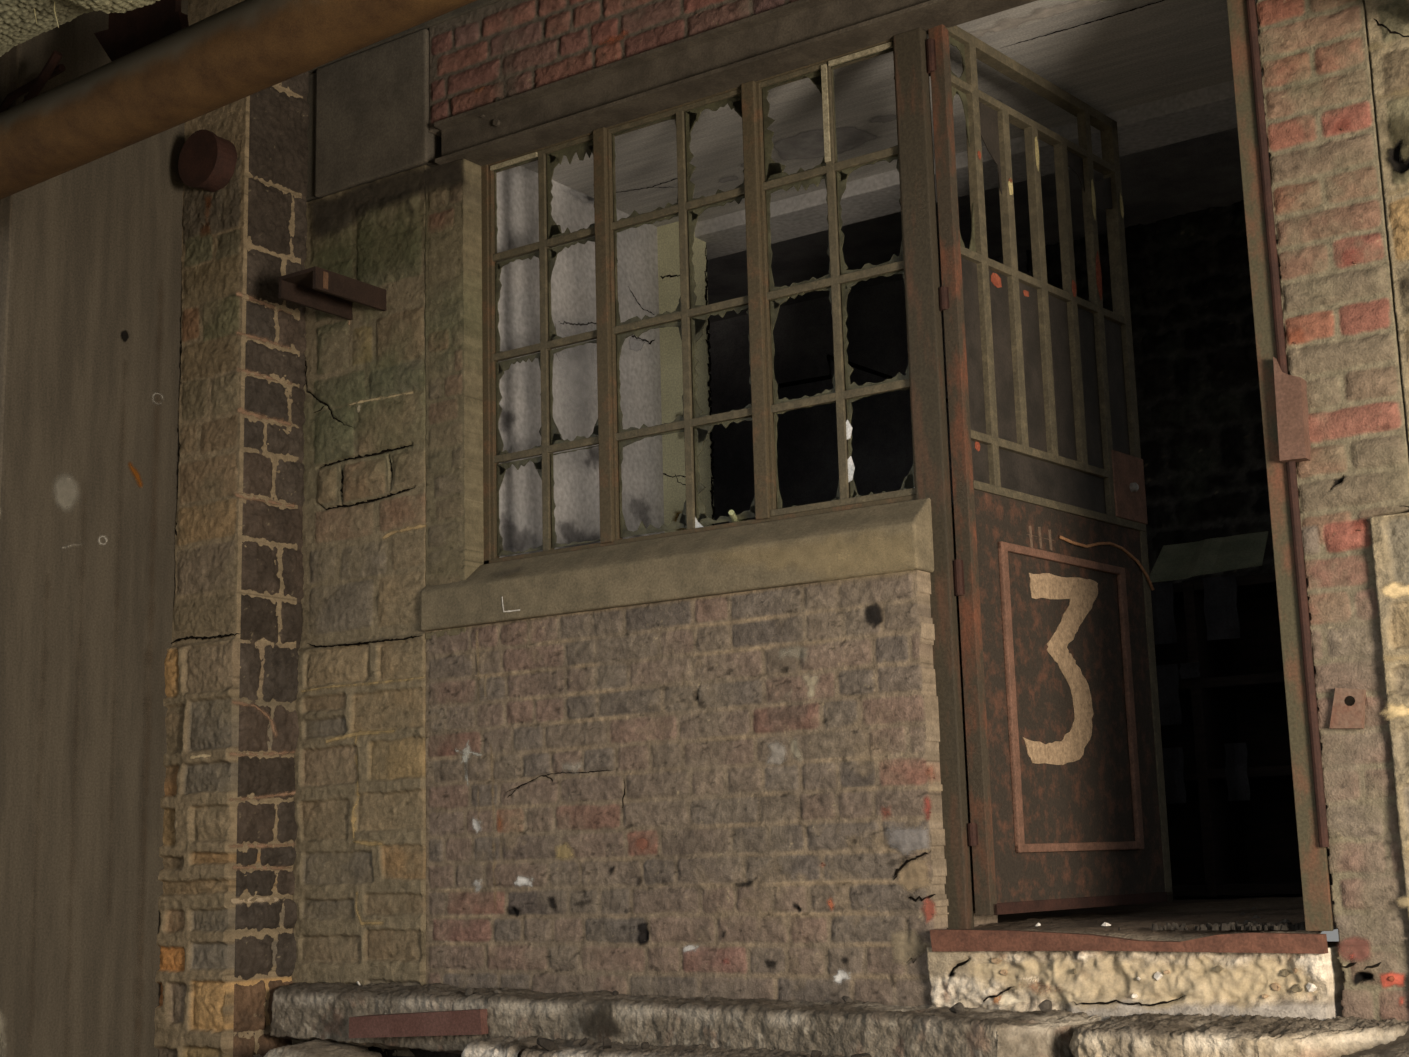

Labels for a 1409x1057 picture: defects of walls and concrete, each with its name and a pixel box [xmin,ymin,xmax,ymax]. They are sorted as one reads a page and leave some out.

crack [304,357,354,428]